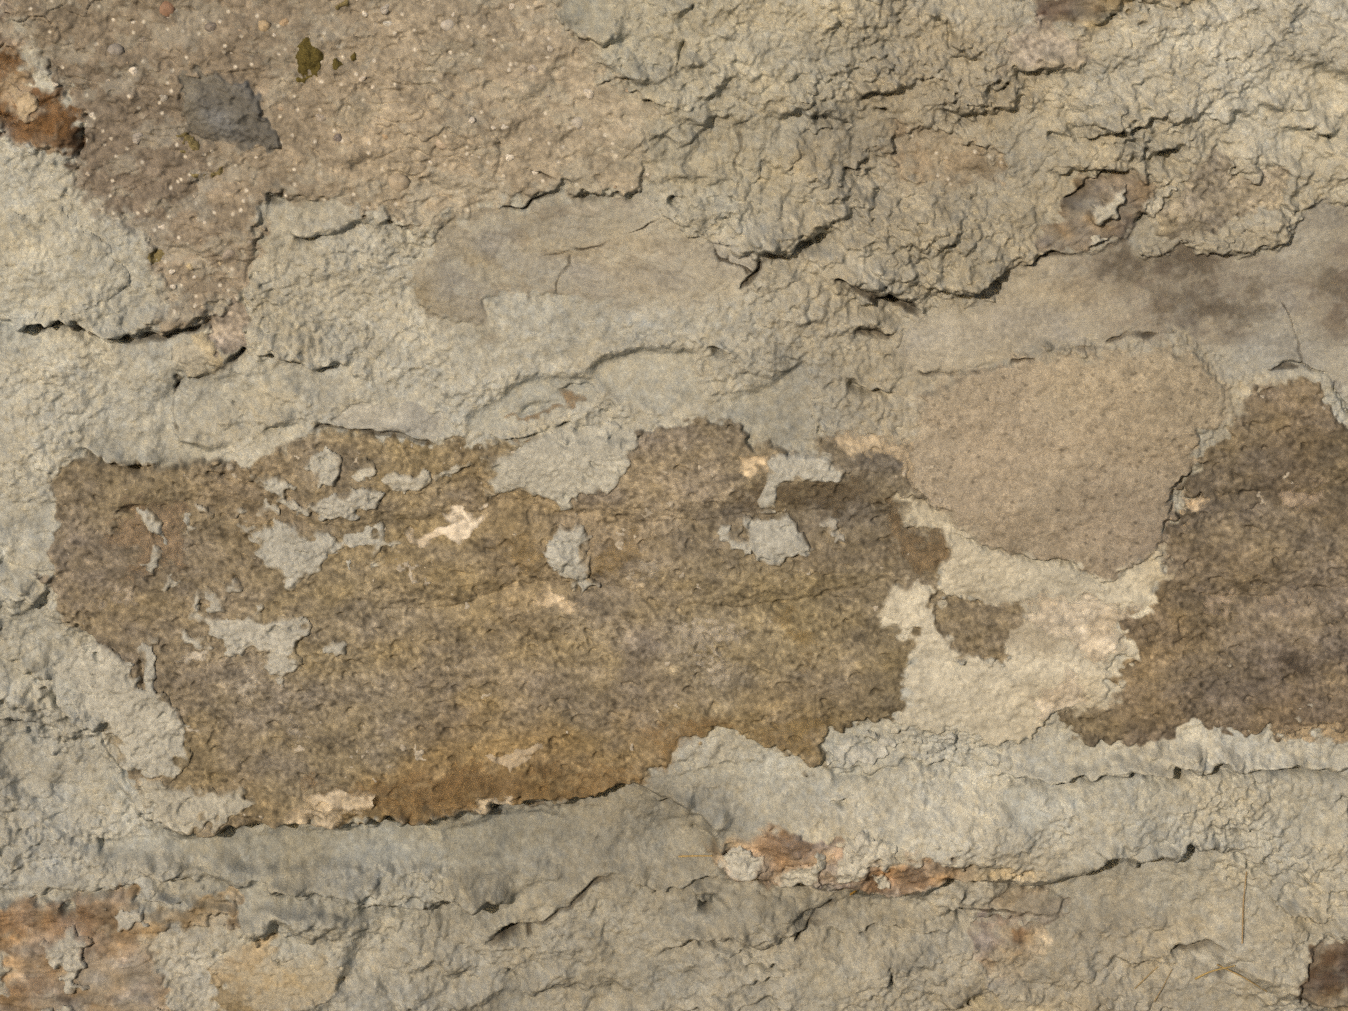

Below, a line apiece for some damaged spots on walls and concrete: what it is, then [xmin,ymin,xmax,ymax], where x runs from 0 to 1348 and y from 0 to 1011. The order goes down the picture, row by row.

peeling [348,456,378,482]
peeling [431,460,472,481]
spalling [106,498,280,579]
peeling [712,524,751,556]
spalling [887,499,949,573]
peeling [205,577,243,613]
peeling [172,628,214,652]
peeling [322,640,347,657]
peeling [485,743,544,773]
peeling [102,907,150,933]